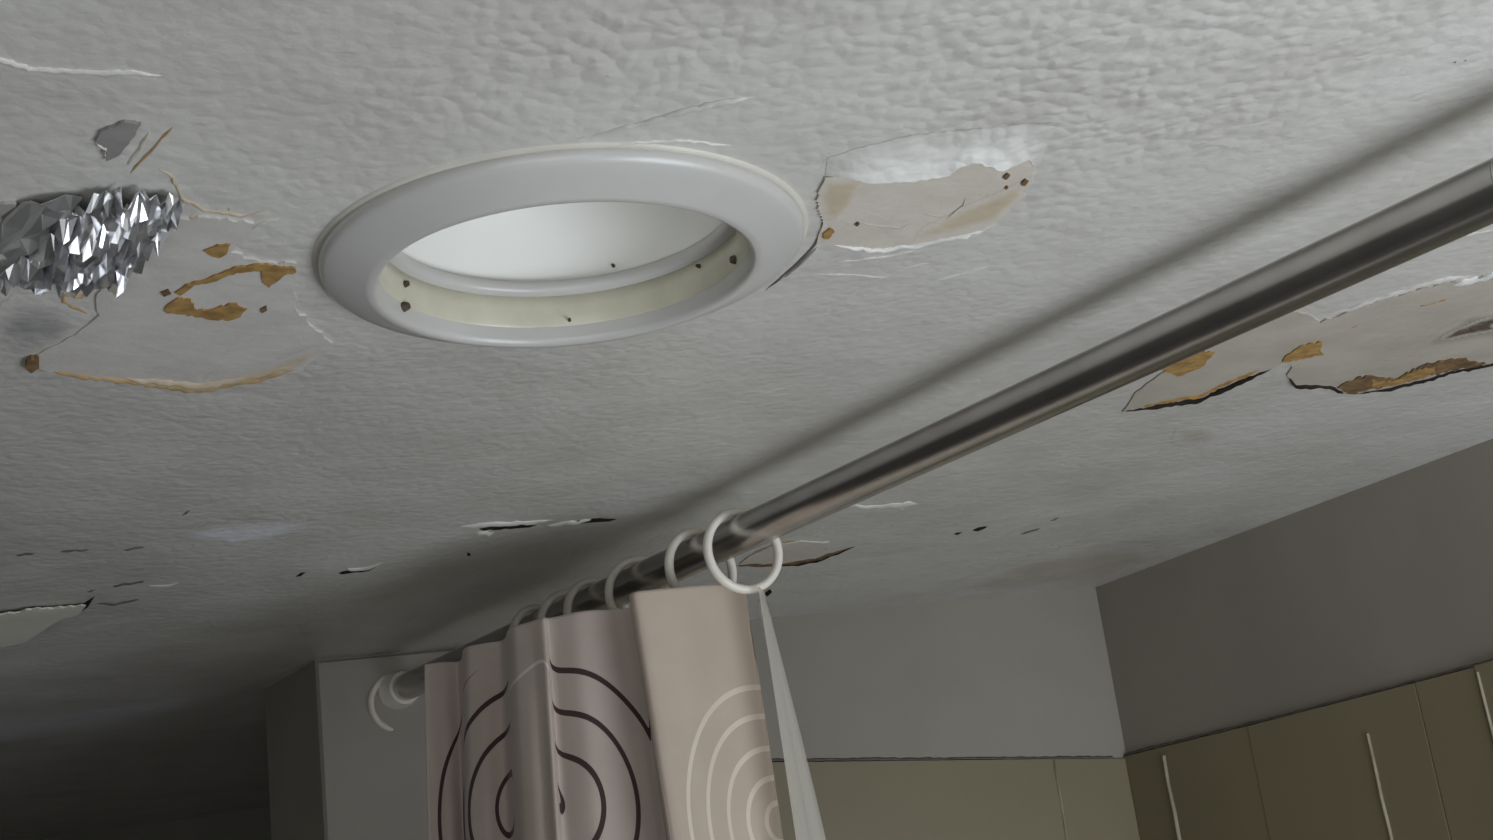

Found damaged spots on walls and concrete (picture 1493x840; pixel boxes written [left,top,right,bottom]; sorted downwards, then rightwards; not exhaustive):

spalling [95,119,141,161]
peeling [816,123,1058,253]
peeling [25,169,333,393]
peeling [1122,272,1493,412]
peeling [0,581,179,648]
crack [296,562,383,577]